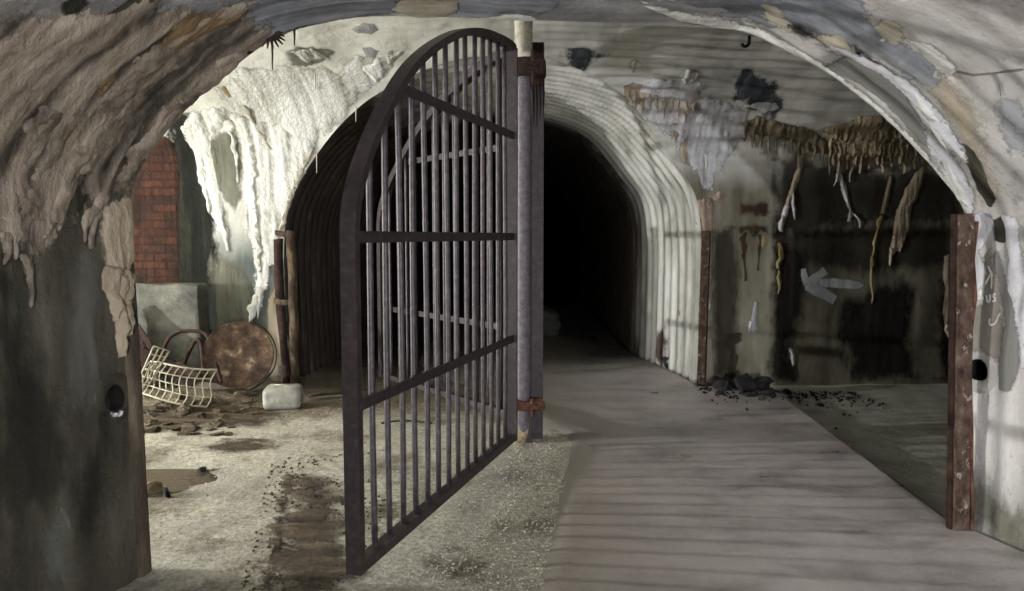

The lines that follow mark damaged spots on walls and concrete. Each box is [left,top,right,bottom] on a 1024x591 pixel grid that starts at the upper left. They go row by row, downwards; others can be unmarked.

spalling [62,0,89,14]
spalling [105,0,155,16]
peeling [287,47,334,66]
peeling [363,47,393,58]
peeling [662,0,956,148]
spalling [67,174,89,216]
water stain [180,48,403,382]
water stain [640,1,1024,391]
peeling [972,212,1003,394]